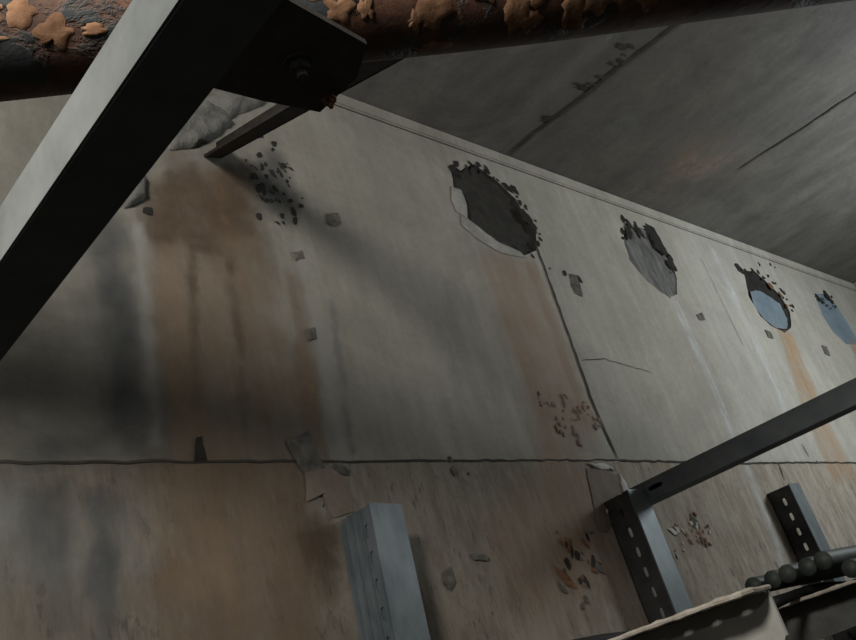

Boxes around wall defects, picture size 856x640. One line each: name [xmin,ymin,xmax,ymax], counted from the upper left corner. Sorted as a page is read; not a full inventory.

crack [509,24,680,155]
crack [739,93,856,170]
spalling [245,136,304,225]
spalling [448,161,543,258]
spalling [621,215,678,298]
crack [0,242,685,476]
spalling [735,262,794,339]
spalling [815,290,856,345]
crack [742,444,856,480]